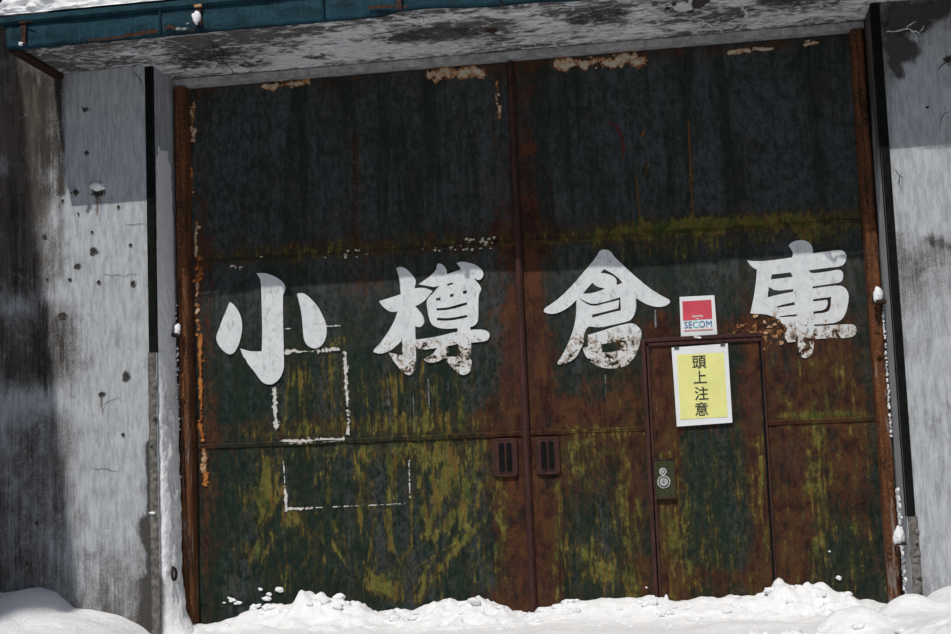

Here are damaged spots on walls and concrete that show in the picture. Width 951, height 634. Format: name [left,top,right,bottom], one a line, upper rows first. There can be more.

water stain [23,74,65,196]
peeling [426,64,502,119]
peeling [551,51,648,74]
water stain [34,300,65,397]
water stain [137,440,164,633]